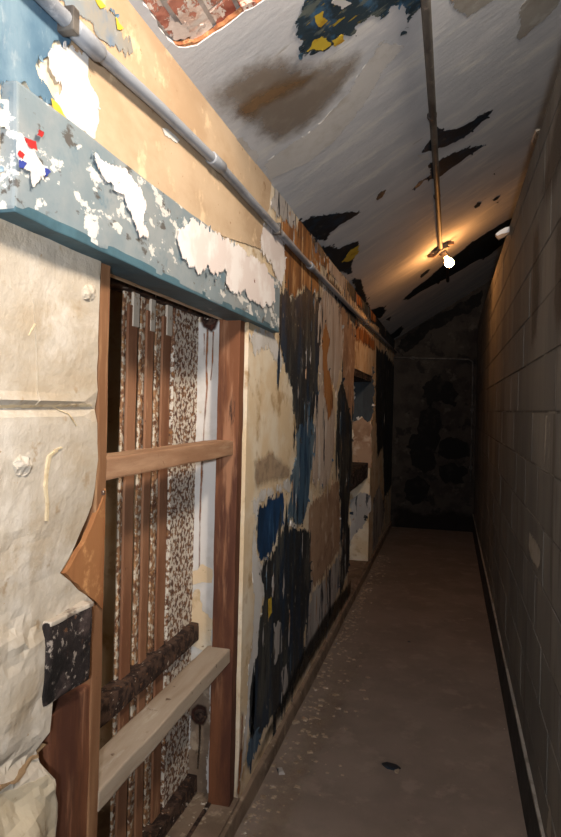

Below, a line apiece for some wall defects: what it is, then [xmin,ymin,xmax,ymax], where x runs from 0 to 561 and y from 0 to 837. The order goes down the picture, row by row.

spalling [143,0,262,47]
peeling [0,0,101,187]
leakage [221,62,354,139]
peeling [410,110,492,191]
peeling [93,152,149,237]
peeling [403,218,512,300]
peeling [177,188,483,793]
crack [0,743,46,791]